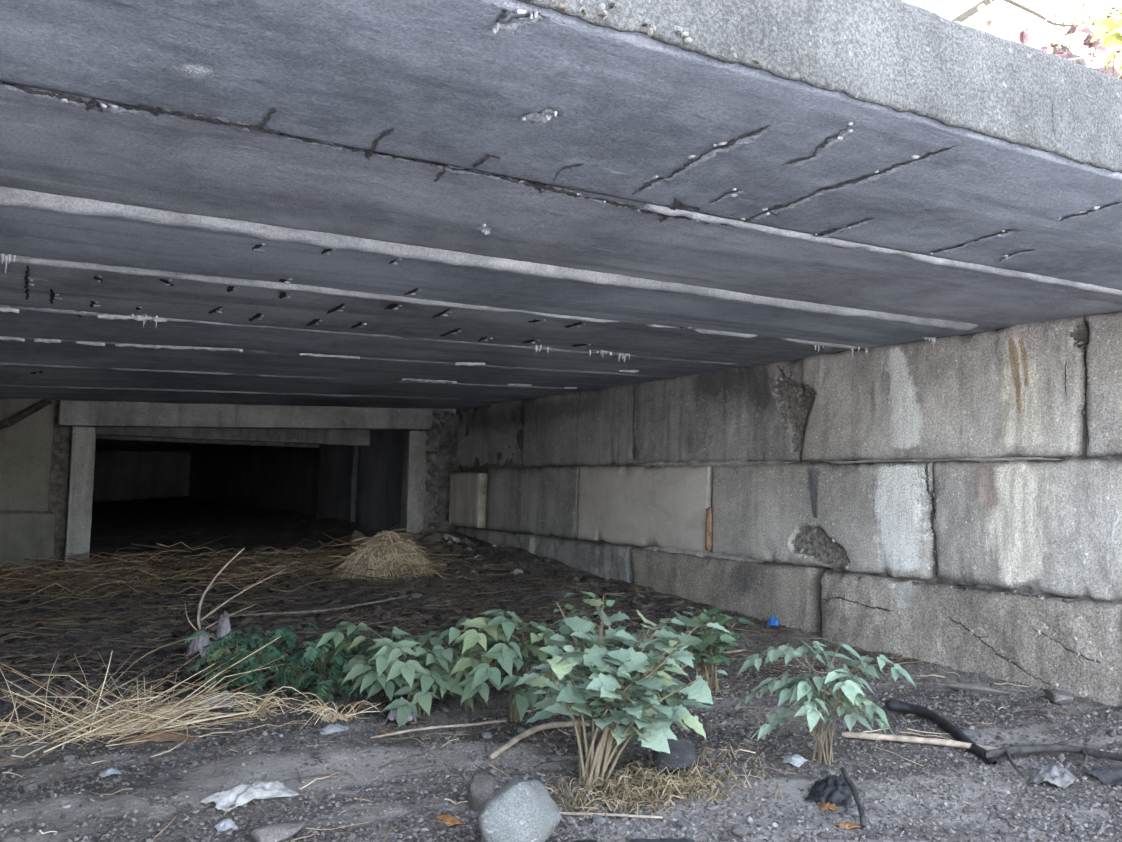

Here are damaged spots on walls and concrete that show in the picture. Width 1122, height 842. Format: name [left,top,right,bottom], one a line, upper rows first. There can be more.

crack [0,82,959,250]
crack [930,229,1035,262]
crack [1058,202,1122,221]
water stain [98,314,167,322]
efflorescence [76,341,243,352]
spalling [771,375,817,451]
corrosion [990,335,1056,448]
crack [925,463,1087,603]
crack [947,616,1059,687]
crack [1031,626,1101,663]